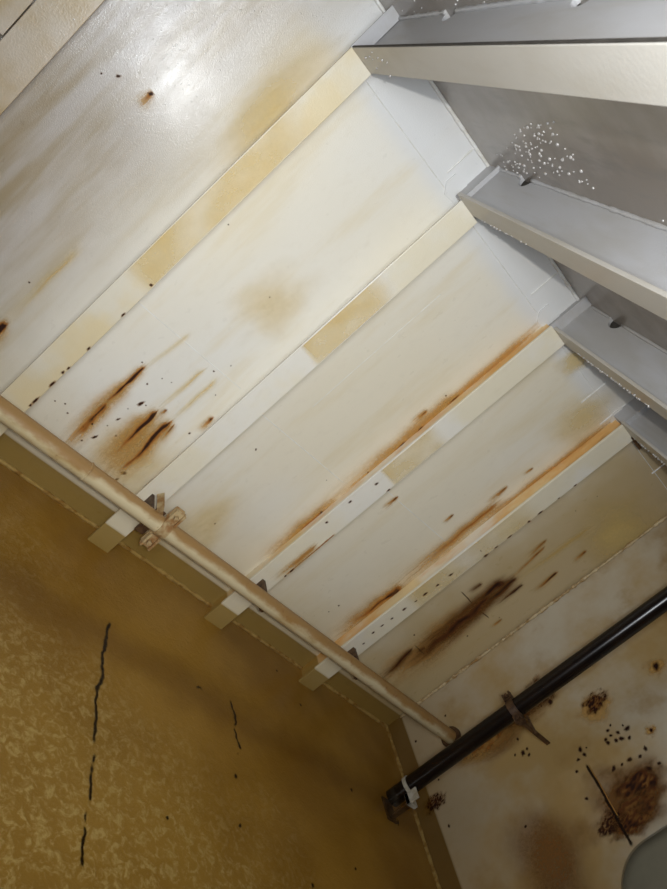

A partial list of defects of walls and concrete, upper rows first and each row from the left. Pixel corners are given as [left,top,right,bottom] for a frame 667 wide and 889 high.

corrosion [68,362,148,441]
corrosion [114,402,174,480]
corrosion [352,334,531,486]
corrosion [284,535,334,577]
corrosion [287,502,333,542]
corrosion [420,426,605,567]
corrosion [349,586,402,627]
corrosion [388,578,522,673]
crack [81,623,111,866]
crack [230,702,241,749]
corrosion [582,691,631,744]
corrosion [585,746,665,836]